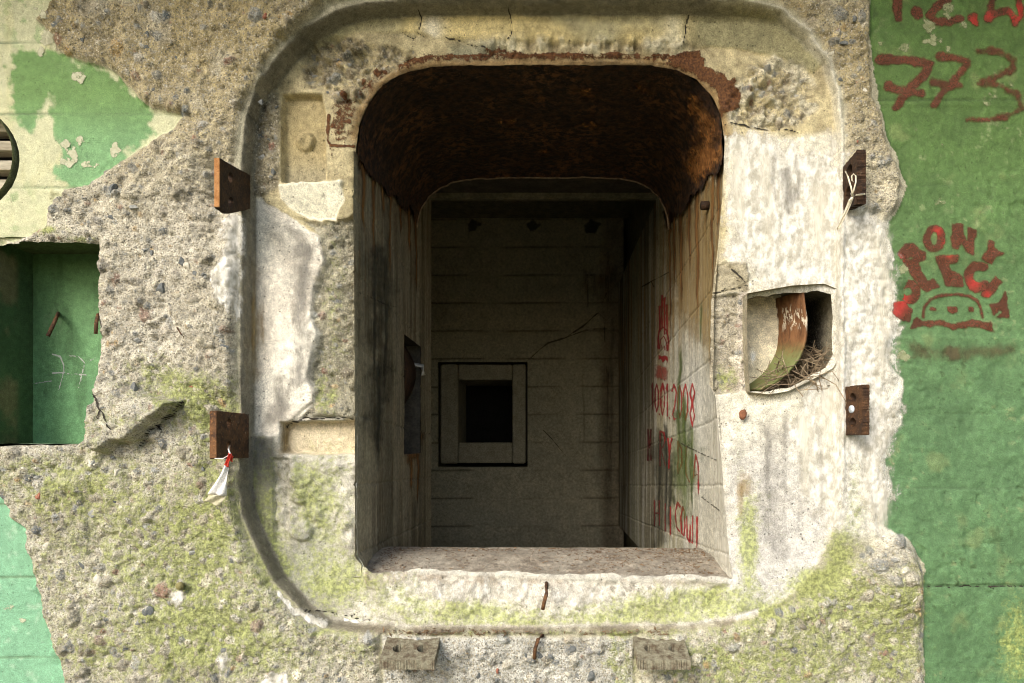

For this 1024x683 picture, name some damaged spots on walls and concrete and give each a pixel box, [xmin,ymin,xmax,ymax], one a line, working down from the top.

crack [402,9,512,48]
peeling [922,3,967,52]
spalling [726,54,818,131]
spalling [769,0,903,222]
rust [326,46,741,353]
leakage [210,213,254,320]
spalling [0,0,634,683]
leakage [170,590,184,607]
leakage [277,591,329,628]
leakage [217,653,227,673]
leakage [260,672,288,683]